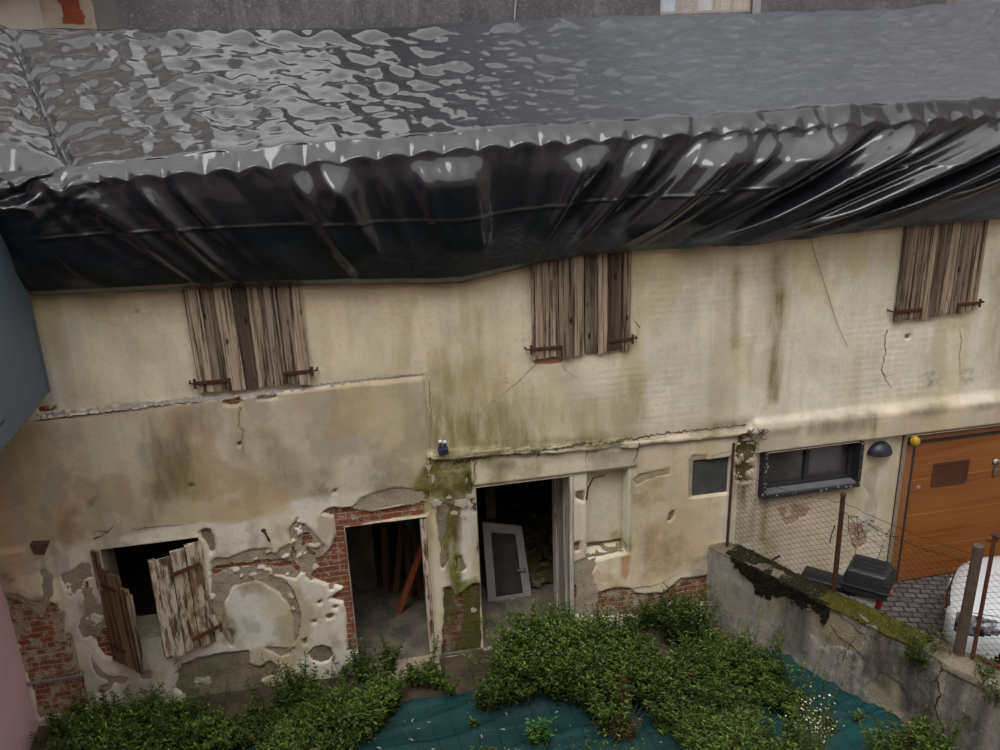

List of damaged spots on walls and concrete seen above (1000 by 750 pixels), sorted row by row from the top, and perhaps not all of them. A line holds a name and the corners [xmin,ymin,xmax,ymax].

flaking render [4,563,112,717]
spalling [91,657,128,693]
flaking render [176,464,473,699]